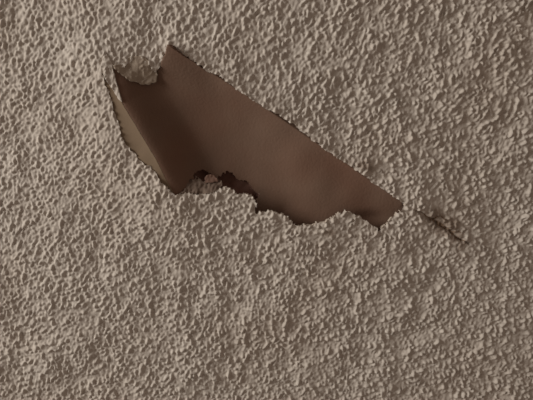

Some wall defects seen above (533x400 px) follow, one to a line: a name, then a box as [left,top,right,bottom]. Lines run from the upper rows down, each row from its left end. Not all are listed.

peeling [101,45,405,231]
crack [416,210,468,243]